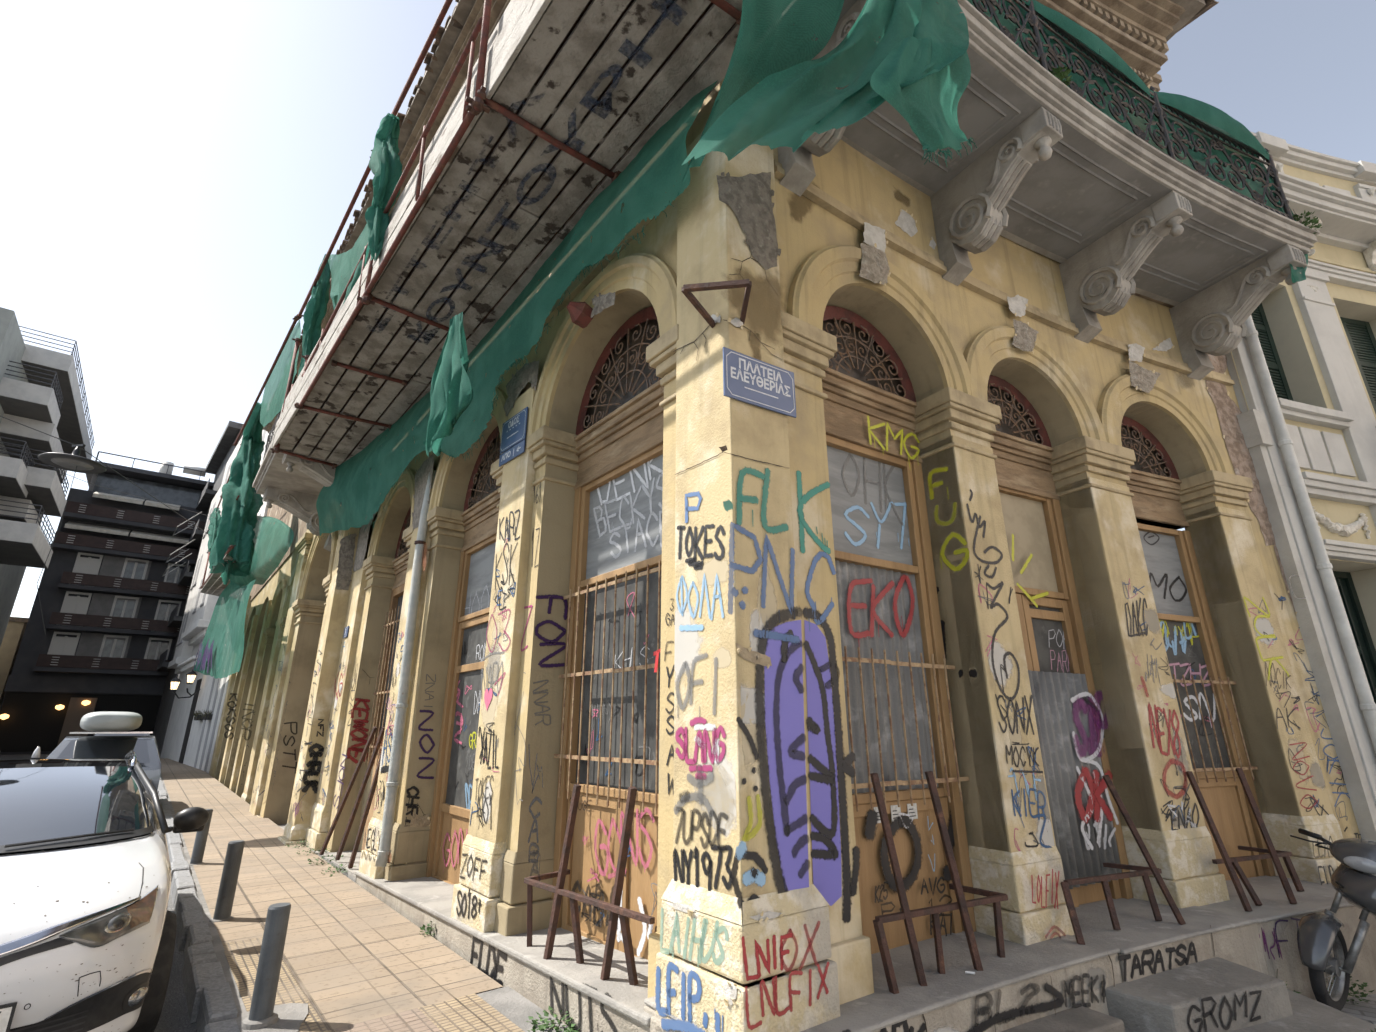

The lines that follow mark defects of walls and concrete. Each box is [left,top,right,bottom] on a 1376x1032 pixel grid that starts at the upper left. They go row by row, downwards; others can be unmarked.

spalling [716,172,781,270]
spalling [859,209,936,286]